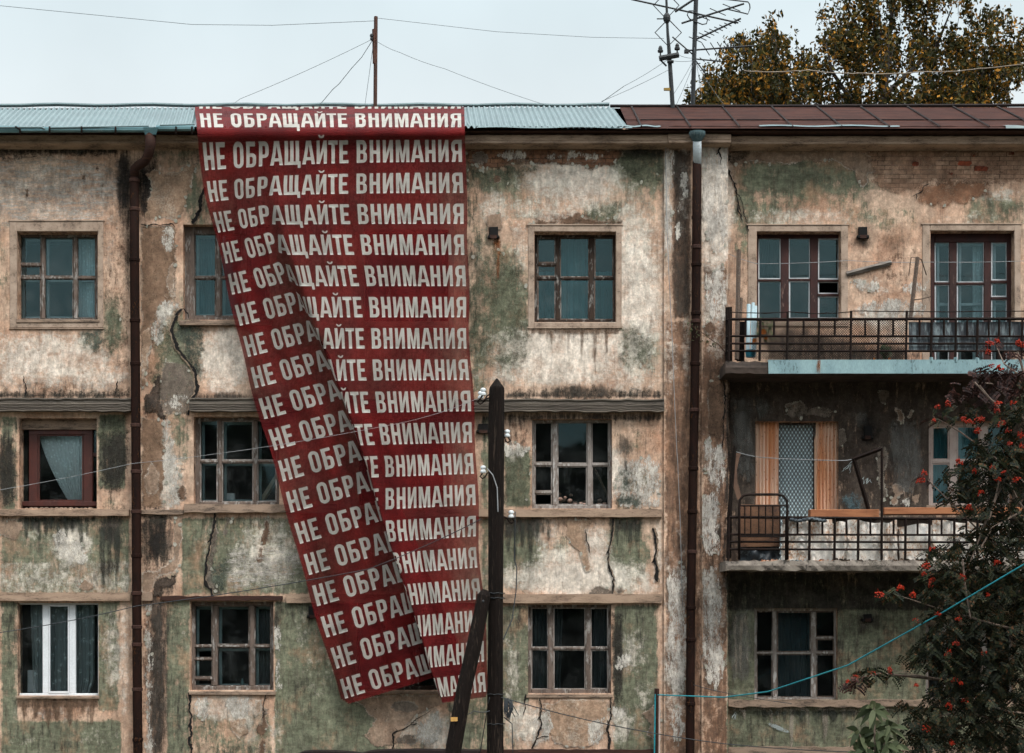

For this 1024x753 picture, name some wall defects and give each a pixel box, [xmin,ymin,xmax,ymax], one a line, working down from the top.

spalling [465,149,689,257]
crack [716,147,749,231]
flaking render [868,151,1024,207]
crack [169,308,200,415]
damp [506,385,660,399]
damp [97,429,130,492]
damp [141,515,168,562]
crack [204,513,216,595]
crack [585,519,615,594]
crack [651,528,660,582]